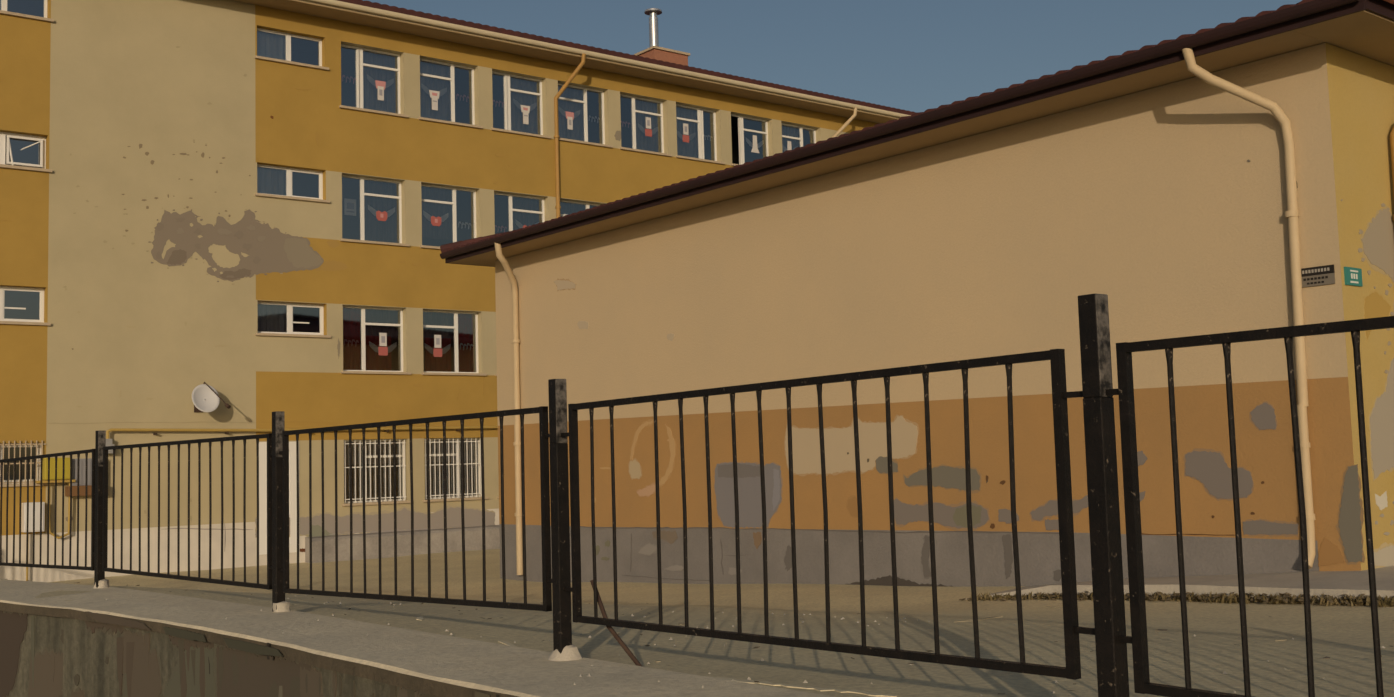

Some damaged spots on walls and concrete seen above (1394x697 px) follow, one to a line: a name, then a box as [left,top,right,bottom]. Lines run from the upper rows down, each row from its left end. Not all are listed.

flaking render [142,194,340,282]
peeling [1358,203,1394,295]
peeling [1370,312,1394,567]